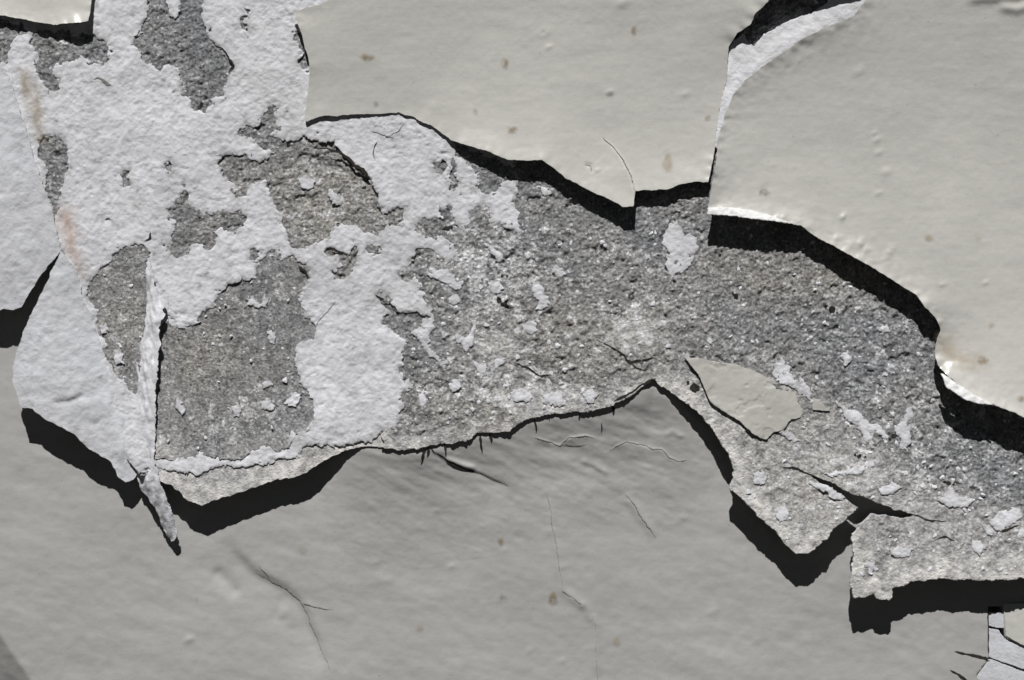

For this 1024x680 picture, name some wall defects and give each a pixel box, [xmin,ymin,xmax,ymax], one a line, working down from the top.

spalling [0,0,404,541]
spalling [292,0,1024,601]
crack [258,567,333,667]